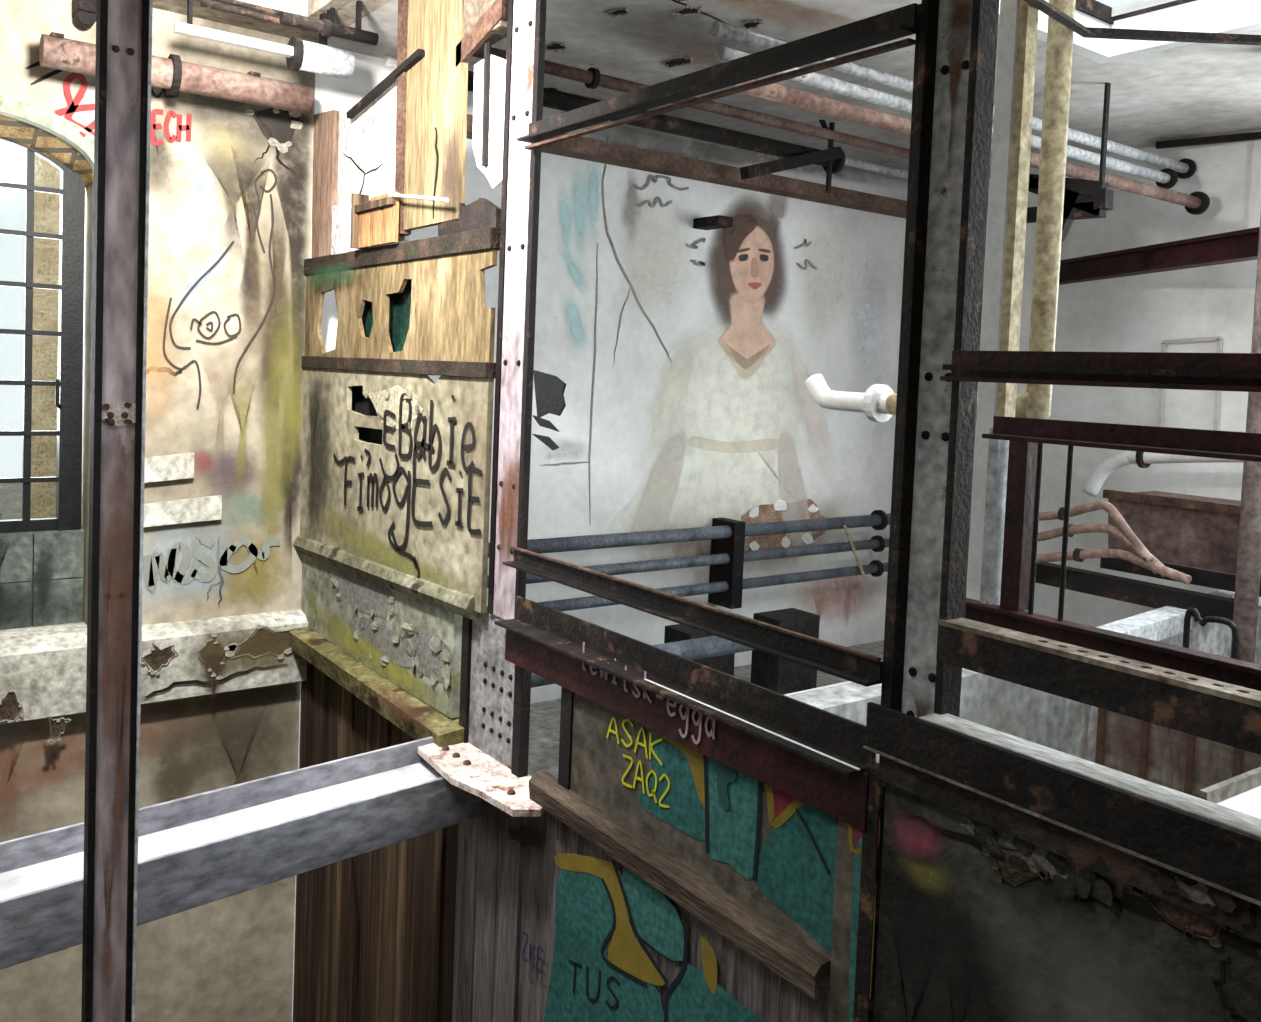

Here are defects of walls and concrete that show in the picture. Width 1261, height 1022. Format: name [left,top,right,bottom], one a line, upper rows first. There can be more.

water stain [218,111,328,544]
spalling [141,643,179,675]
spalling [197,624,305,680]
spalling [0,687,25,723]
corrosion [1082,717,1242,795]
peeling [960,819,1113,907]
peeling [1131,859,1237,948]